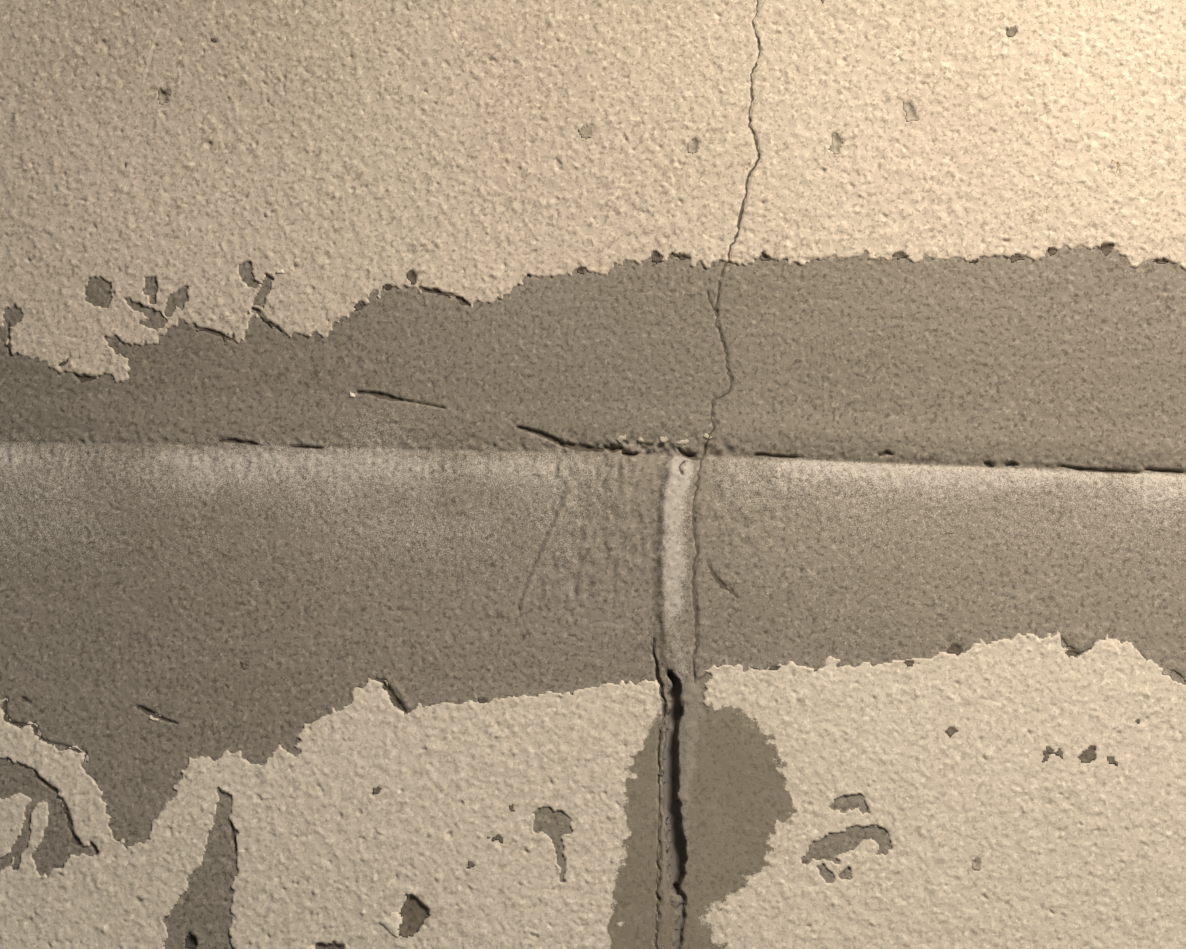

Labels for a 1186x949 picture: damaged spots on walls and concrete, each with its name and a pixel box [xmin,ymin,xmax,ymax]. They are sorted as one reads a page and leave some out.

crack [517,0,761,949]
crack [755,452,801,460]
crack [1061,466,1180,474]
peeling [0,242,1186,849]
peeling [0,758,99,876]
peeling [163,788,239,949]
peeling [533,807,573,882]
water stain [607,702,797,949]
peeling [801,793,893,883]
spalling [305,940,345,949]
spalling [379,894,430,938]